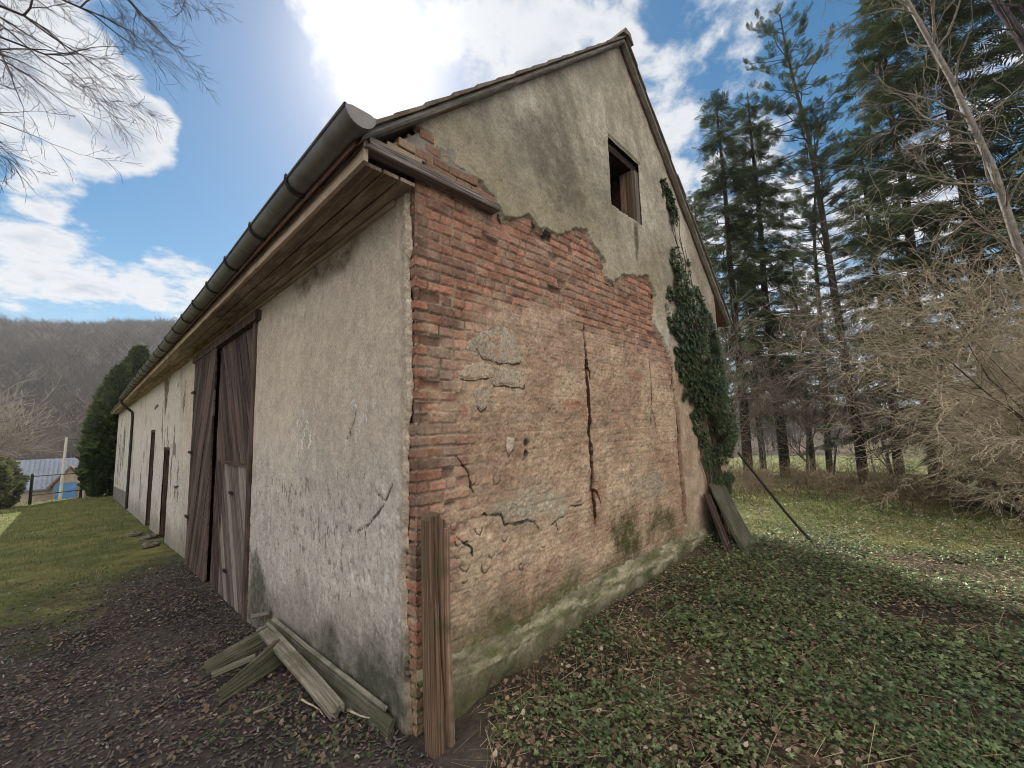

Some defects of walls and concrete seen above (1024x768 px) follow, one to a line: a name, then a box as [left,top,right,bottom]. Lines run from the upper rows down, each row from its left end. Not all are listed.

crack [358,484,393,536]
crack [450,328,601,584]
flaking render [399,179,685,737]